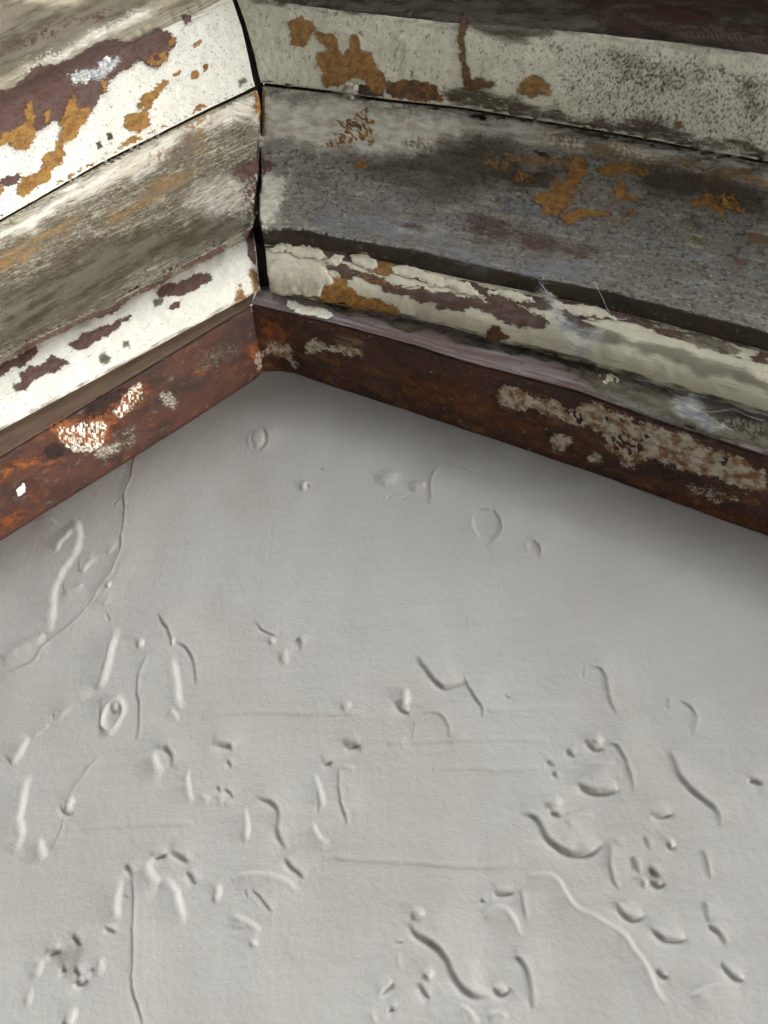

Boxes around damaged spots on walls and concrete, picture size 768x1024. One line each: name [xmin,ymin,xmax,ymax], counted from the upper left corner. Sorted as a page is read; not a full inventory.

peeling [0,27,218,197]
corrosion [457,3,495,90]
corrosion [516,75,551,98]
corrosion [249,318,300,372]
peeling [0,228,768,391]
corrosion [0,382,149,480]
peeling [94,425,138,459]
peeling [496,384,768,504]